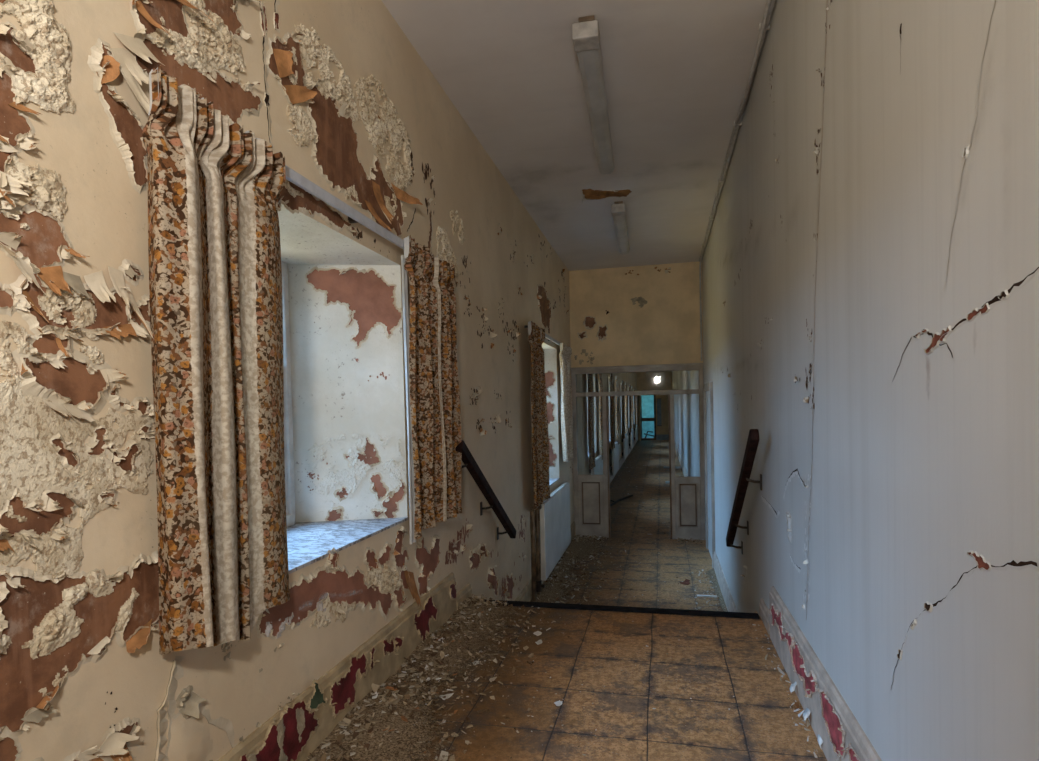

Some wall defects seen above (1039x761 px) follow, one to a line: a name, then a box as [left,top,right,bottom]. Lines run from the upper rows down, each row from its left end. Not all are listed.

peeling [0,21,155,478]
crack [259,0,280,150]
peeling [278,179,390,257]
peeling [265,31,436,238]
peeling [305,267,403,362]
crack [892,267,1039,381]
crack [943,0,996,290]
peeling [0,488,82,552]
peeling [256,436,527,652]
peeling [0,550,159,761]
peeling [235,635,404,761]
crack [890,550,1039,689]